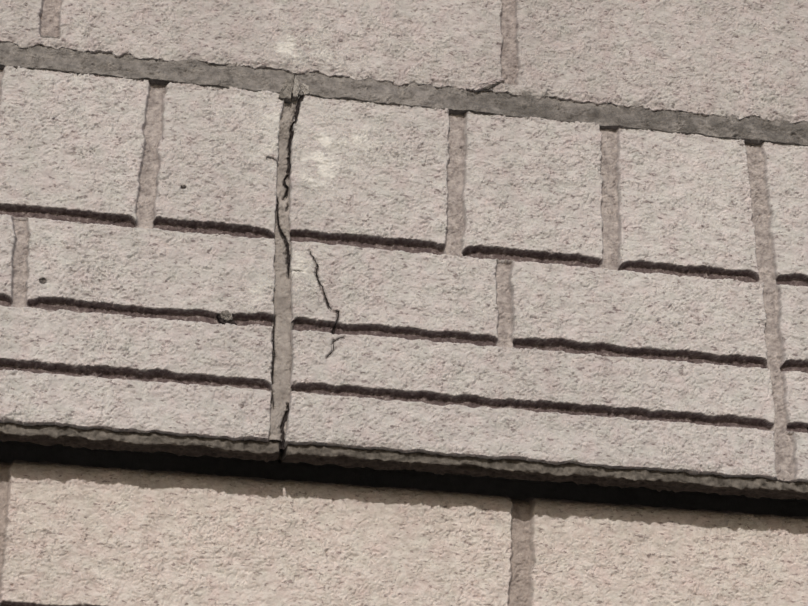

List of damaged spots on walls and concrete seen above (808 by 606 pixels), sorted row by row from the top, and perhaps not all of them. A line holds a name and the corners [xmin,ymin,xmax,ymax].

crack [266,80,343,357]
crack [272,317,289,450]